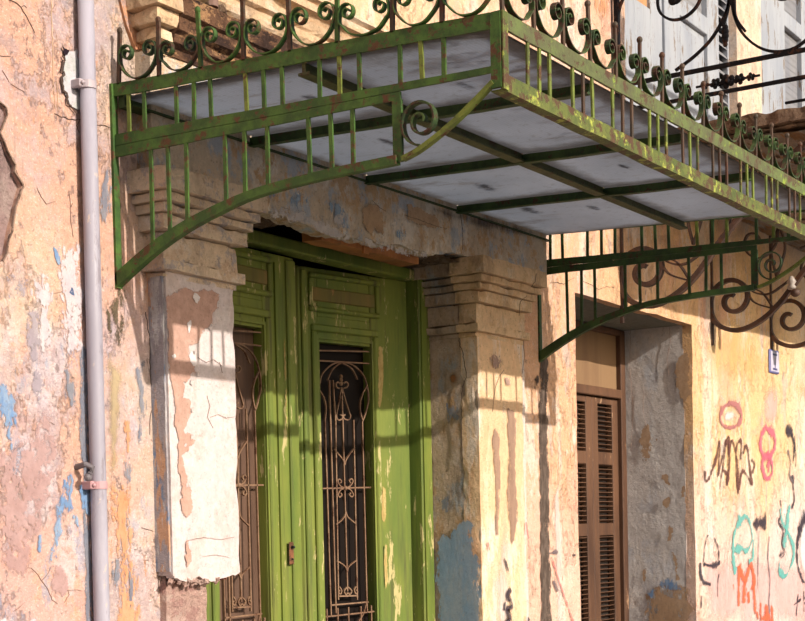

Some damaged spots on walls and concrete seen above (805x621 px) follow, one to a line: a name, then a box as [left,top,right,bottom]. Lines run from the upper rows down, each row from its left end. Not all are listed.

flaking render [60,46,80,114]
flaking render [0,101,25,262]
peeling [0,384,91,597]
peeling [166,287,221,517]
crack [454,333,467,460]
leakage [492,408,518,543]
peeling [639,424,658,461]
flaking render [165,576,227,588]
peeling [434,520,482,621]